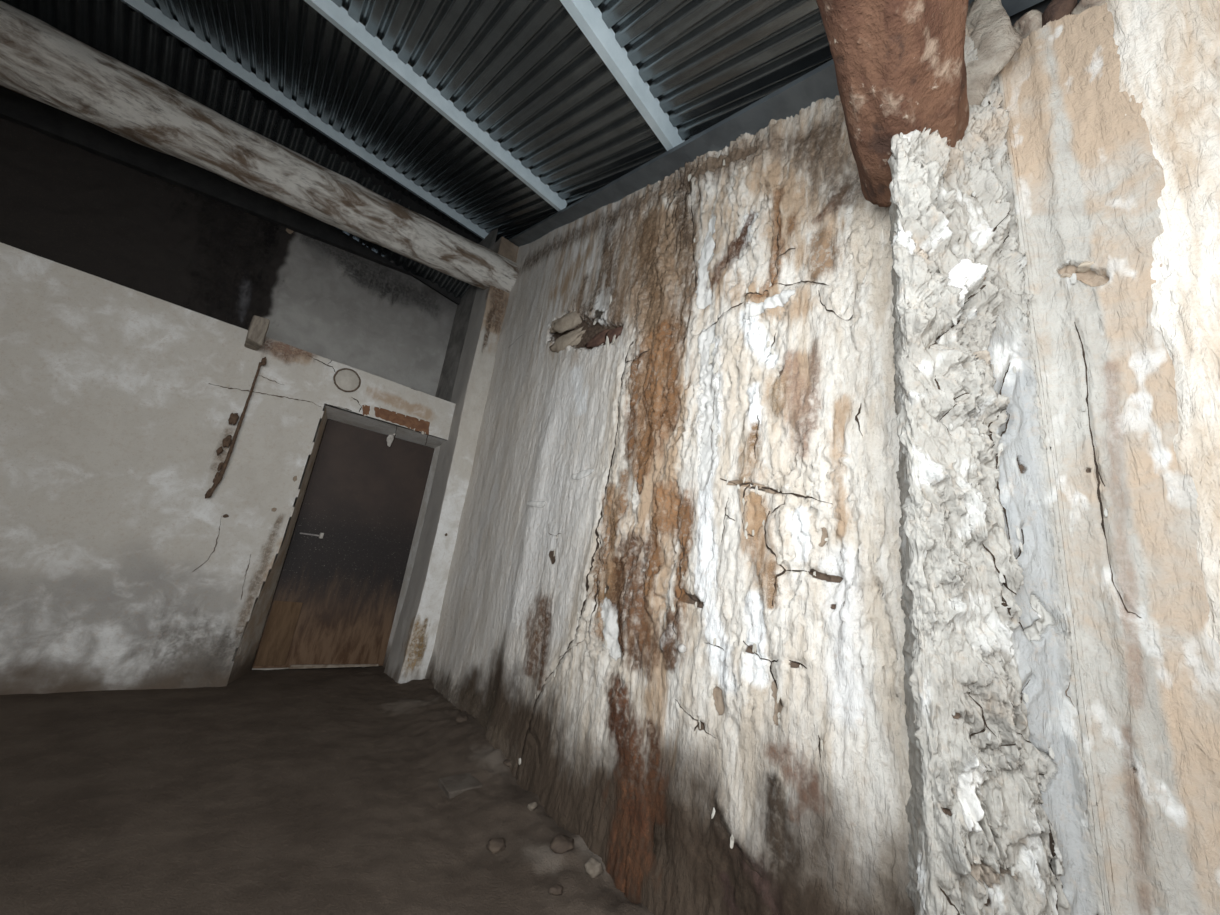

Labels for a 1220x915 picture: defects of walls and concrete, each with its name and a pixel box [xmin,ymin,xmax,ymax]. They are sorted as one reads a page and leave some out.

spalling [549,287,623,353]
rust [711,213,754,284]
spalling [1058,260,1109,287]
crack [208,355,362,412]
rust [593,206,695,677]
crack [688,201,853,606]
rust [775,344,817,450]
crack [671,537,700,634]
crack [704,638,807,706]
rust [607,676,665,898]
leakage [667,746,824,915]
spalling [970,861,1018,906]